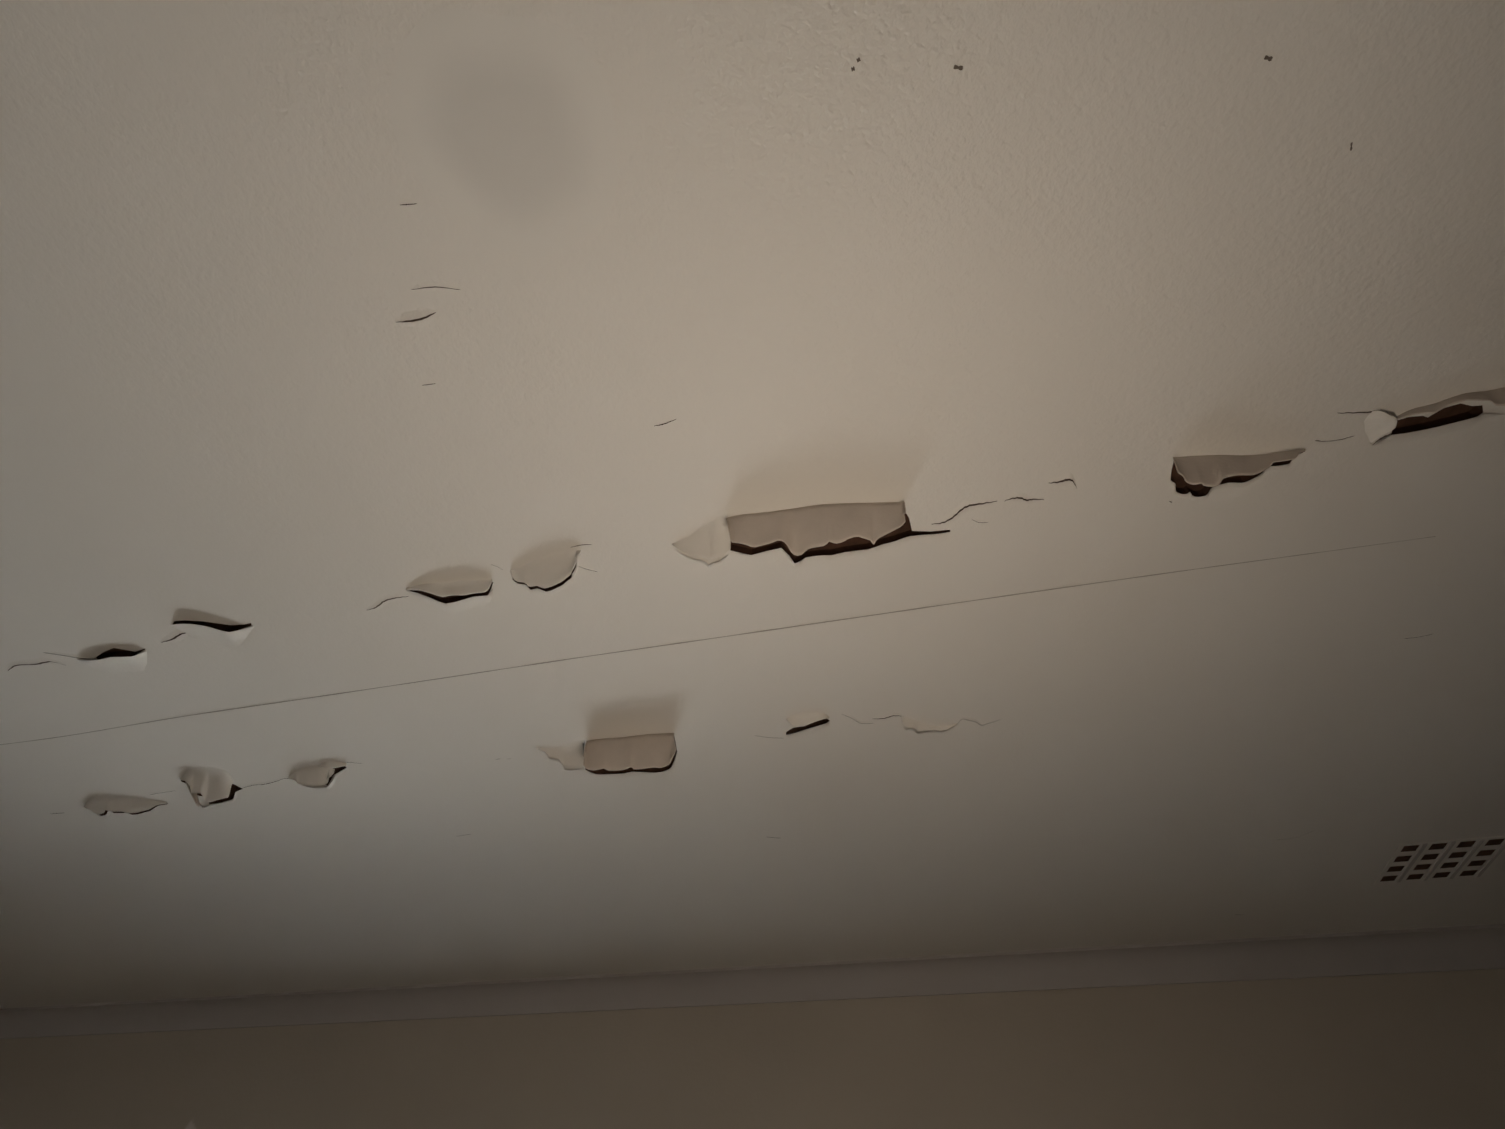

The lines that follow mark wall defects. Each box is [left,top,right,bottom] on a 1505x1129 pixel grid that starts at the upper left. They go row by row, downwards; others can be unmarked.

peeling [1169,387,1505,504]
crack [931,472,1077,527]
peeling [672,502,950,569]
peeling [366,542,597,613]
peeling [77,620,254,675]
peeling [755,712,1000,739]
peeling [536,733,677,776]
peeling [84,761,362,818]